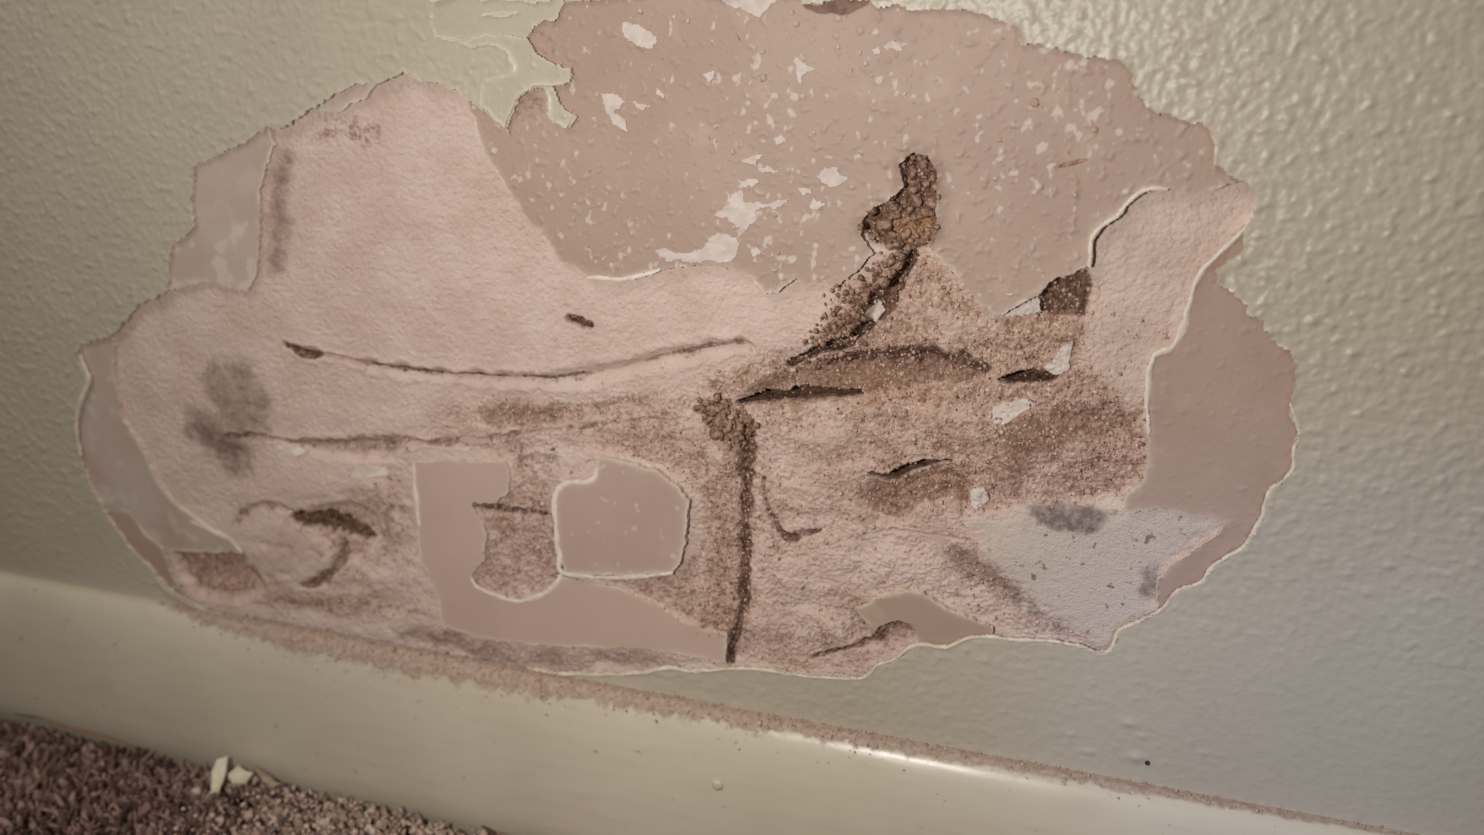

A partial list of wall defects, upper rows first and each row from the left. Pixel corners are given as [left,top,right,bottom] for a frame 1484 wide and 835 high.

peeling [74,354,92,457]
crack [286,342,324,359]
crack [367,362,588,379]
crack [647,339,743,359]
spalling [114,0,1301,681]
crack [789,249,919,366]
crack [729,423,822,662]
crack [814,621,914,656]